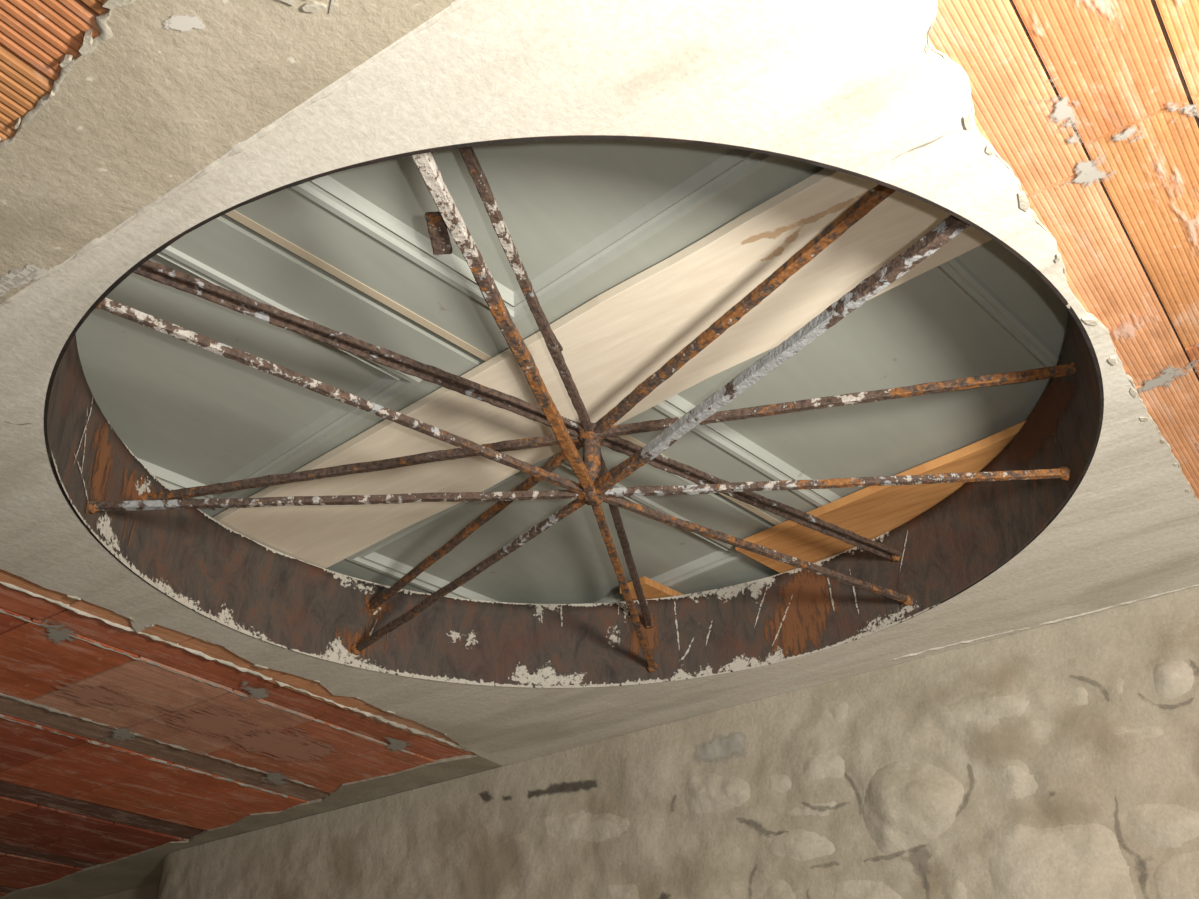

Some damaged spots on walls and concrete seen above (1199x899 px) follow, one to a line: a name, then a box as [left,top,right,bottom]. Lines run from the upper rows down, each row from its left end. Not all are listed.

flaking render [0,0,139,148]
flaking render [963,98,1198,500]
corrosion [86,423,154,514]
peeling [123,442,172,496]
corrosion [1008,380,1073,485]
peeling [51,451,941,688]
corrosion [764,565,838,657]